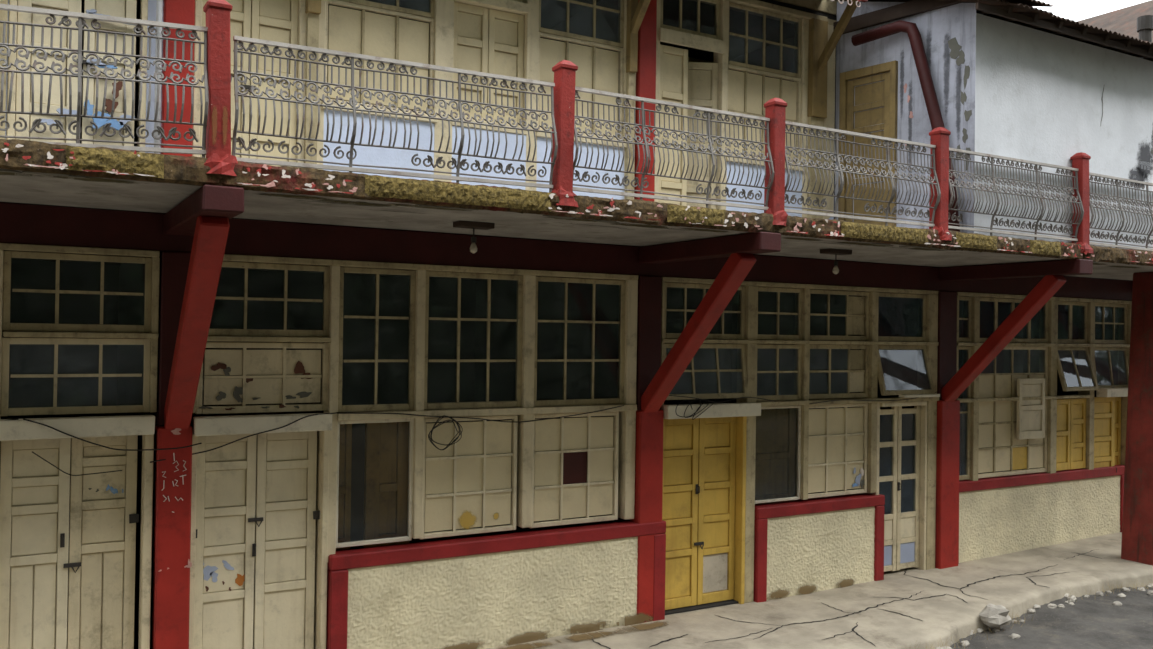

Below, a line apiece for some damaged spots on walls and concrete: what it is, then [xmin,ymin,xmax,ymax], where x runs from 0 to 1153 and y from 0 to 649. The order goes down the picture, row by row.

damp [900,53,912,162]
damp [927,35,961,131]
peeling [2,142,155,177]
peeling [237,164,358,194]
peeling [787,218,844,237]
peeling [199,361,312,410]
crack [650,549,1102,647]